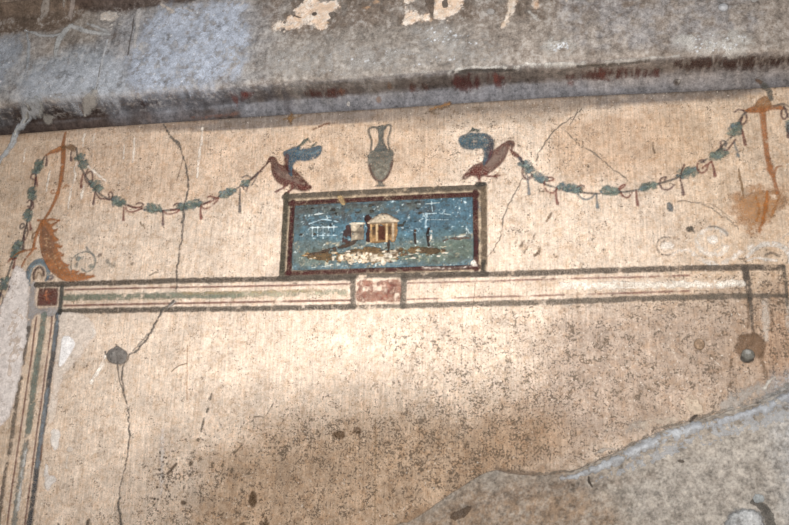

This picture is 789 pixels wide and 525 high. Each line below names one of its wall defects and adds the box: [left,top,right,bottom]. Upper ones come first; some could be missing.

peeling [272,0,340,32]
peeling [402,0,463,26]
crack [117,124,189,525]